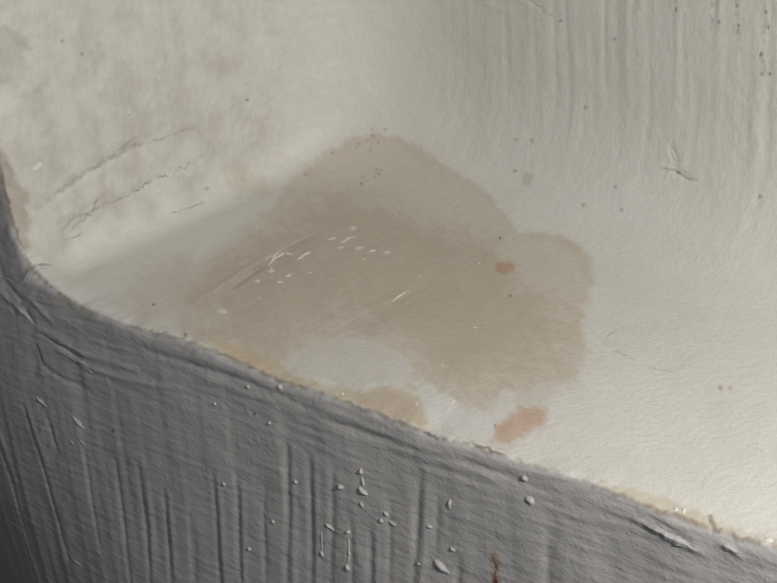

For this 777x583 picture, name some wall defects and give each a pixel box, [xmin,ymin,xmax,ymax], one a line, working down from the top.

water stain [93,128,628,437]
peeling [414,374,565,442]